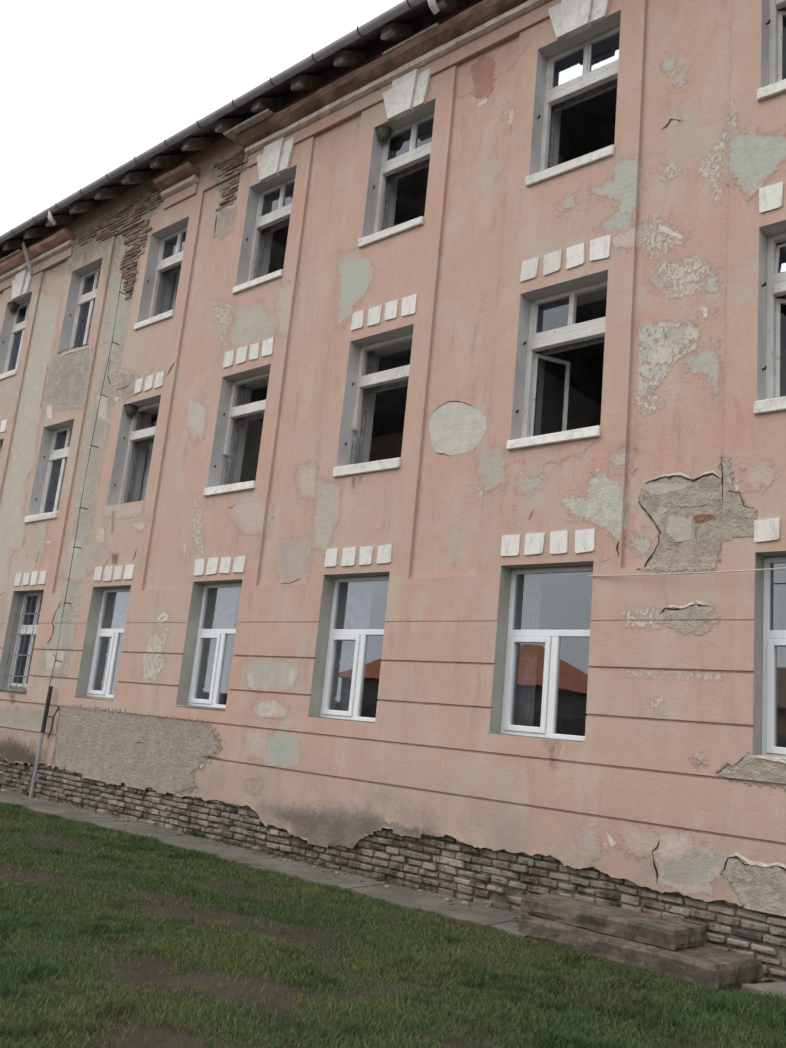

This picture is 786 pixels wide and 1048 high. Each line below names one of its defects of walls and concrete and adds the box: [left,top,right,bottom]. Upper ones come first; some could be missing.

flaking render [199,144,249,240]
peeling [553,97,786,416]
flaking render [0,185,164,680]
spalling [555,441,779,575]
spalling [619,600,721,637]
flaking render [51,704,222,796]
spalling [689,749,786,792]
spalling [613,816,786,917]